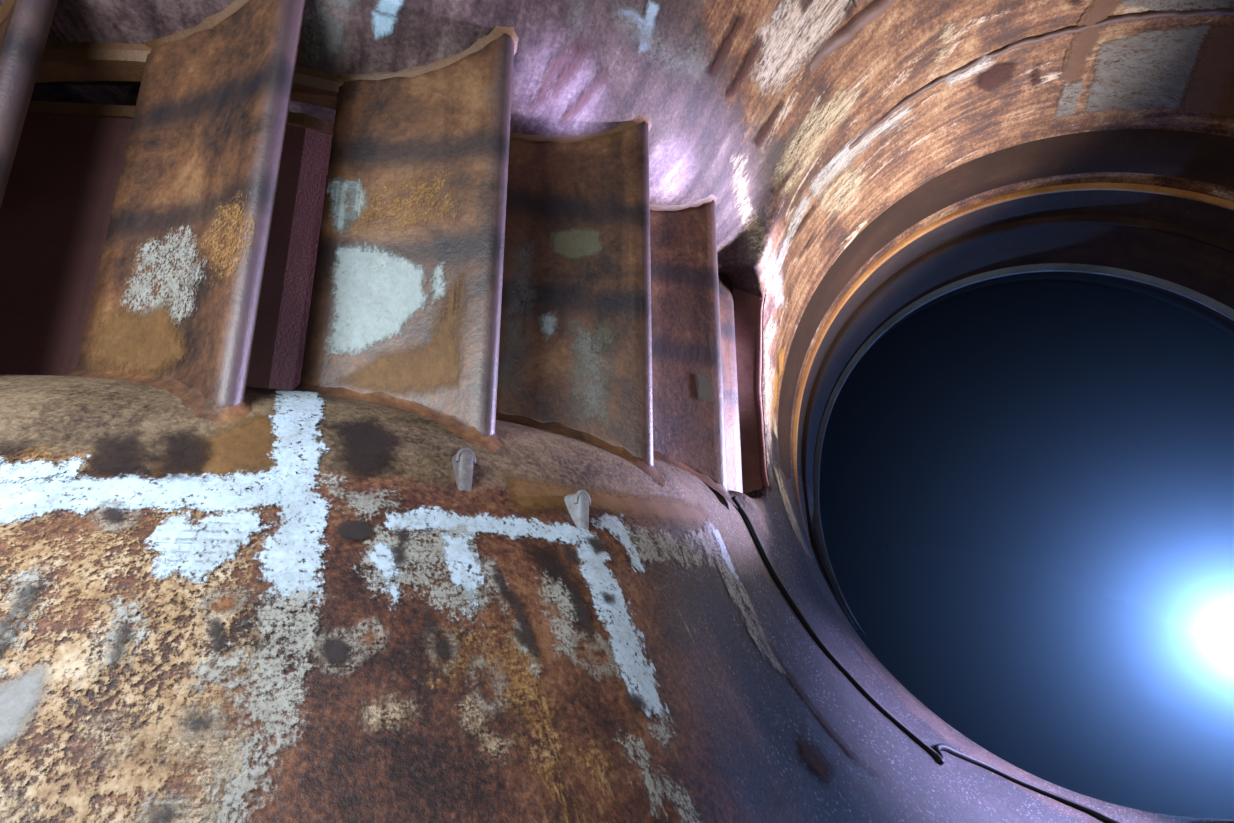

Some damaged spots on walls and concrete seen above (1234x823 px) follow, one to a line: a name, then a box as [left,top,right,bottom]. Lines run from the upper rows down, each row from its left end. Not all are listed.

peeling [1121,0,1234,11]
rust [755,96,785,147]
rust [978,63,1016,92]
peeling [1085,25,1211,113]
peeling [122,226,207,325]
peeling [326,179,445,354]
rust [152,415,279,478]
rust [505,474,710,527]
peeling [0,390,786,823]
rust [525,541,593,634]
rust [0,509,265,823]
rust [430,558,579,822]